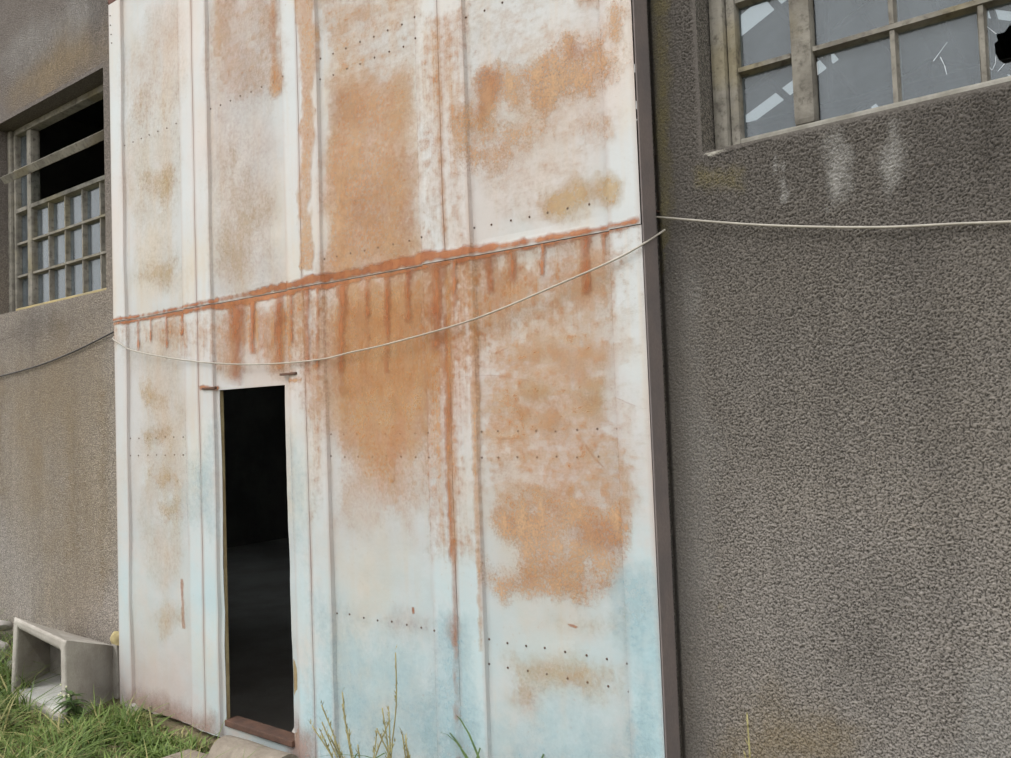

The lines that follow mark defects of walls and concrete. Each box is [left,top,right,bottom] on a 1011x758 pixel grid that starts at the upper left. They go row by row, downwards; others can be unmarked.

corrosion [295,0,319,199]
corrosion [432,1,625,167]
corrosion [547,178,618,216]
corrosion [113,212,638,554]
corrosion [493,485,629,602]